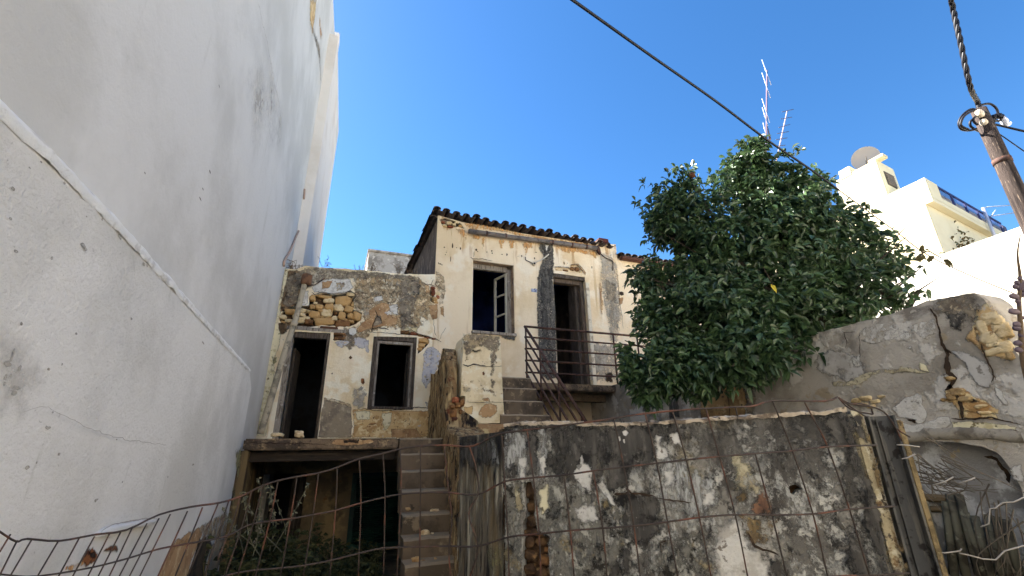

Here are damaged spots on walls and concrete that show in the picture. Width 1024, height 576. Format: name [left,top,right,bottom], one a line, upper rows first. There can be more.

peeling [279,243,461,359]
flaking render [324,378,429,445]
peeling [422,347,440,388]
water stain [537,243,557,380]
water stain [590,254,621,382]
crack [930,308,1020,431]
flaking render [945,303,1009,419]
water stain [459,419,687,576]